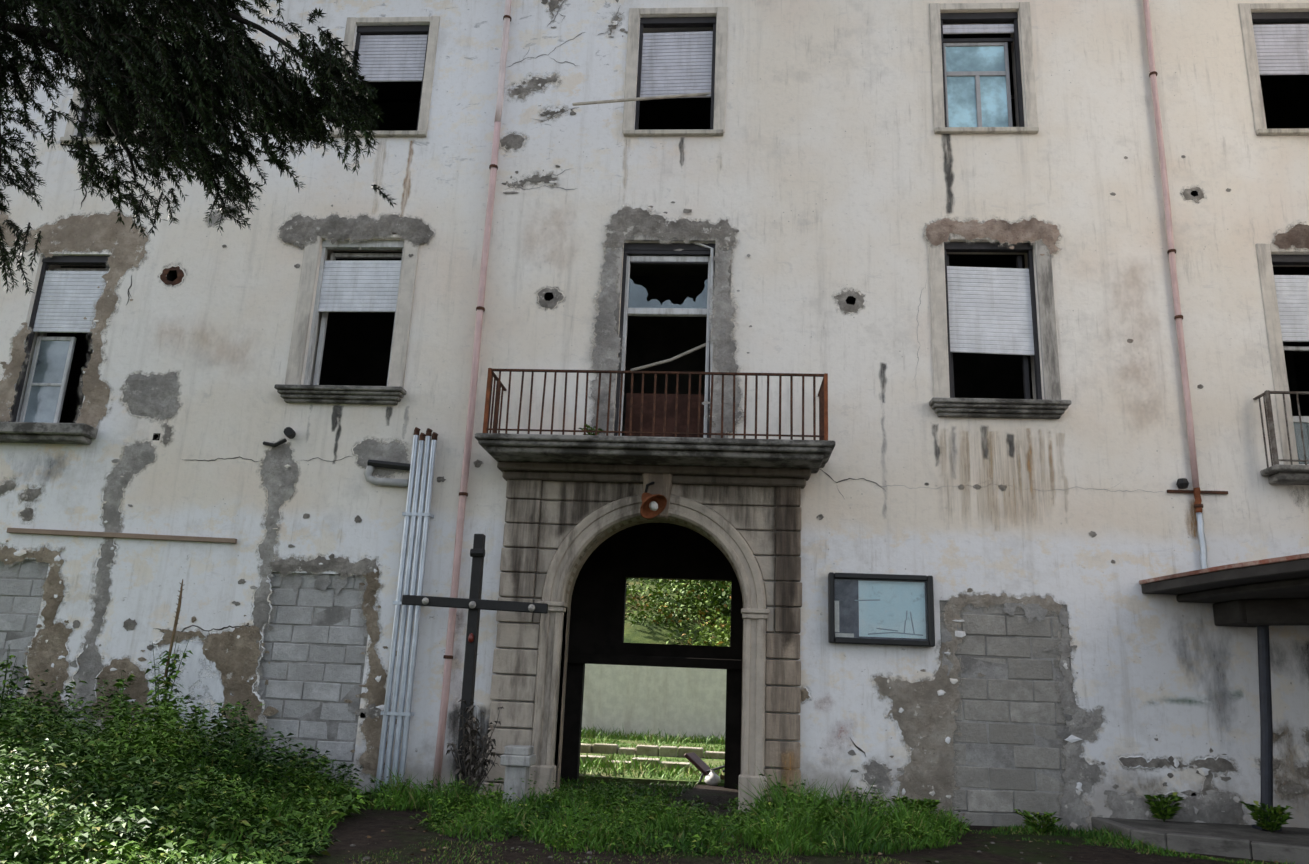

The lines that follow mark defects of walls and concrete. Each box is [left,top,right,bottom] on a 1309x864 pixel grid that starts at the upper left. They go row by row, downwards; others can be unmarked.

spalling [279,204,434,268]
spalling [924,216,1061,256]
spalling [1272,222,1309,251]
spalling [591,201,752,433]
spalling [0,204,397,777]
crack [182,455,262,463]
spalling [351,438,410,478]
rust [1007,434,1032,491]
spalling [847,588,1246,829]